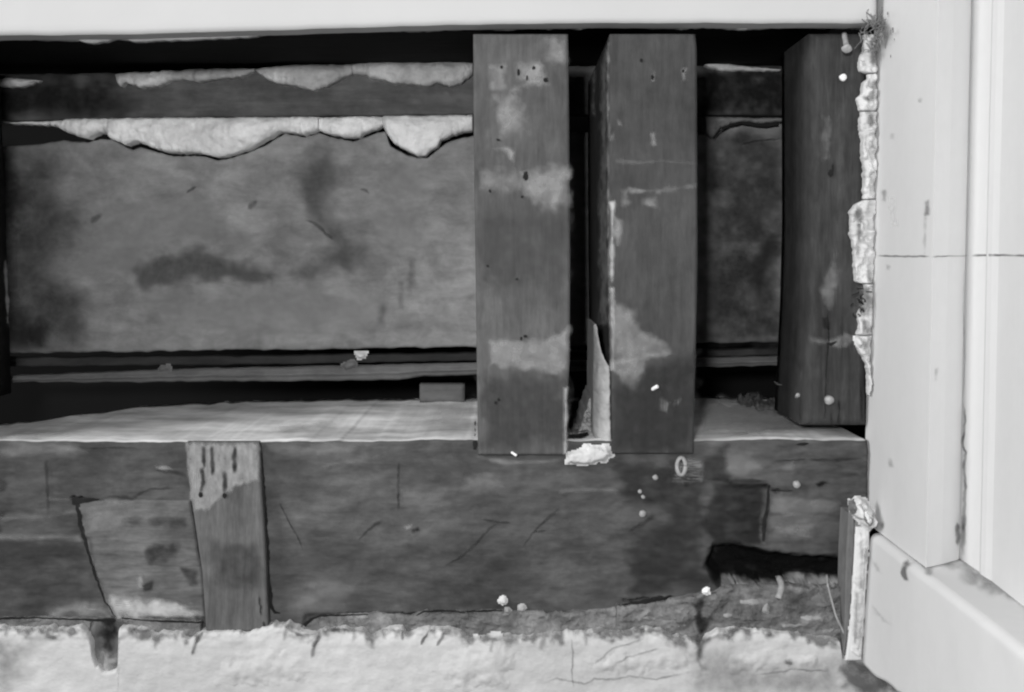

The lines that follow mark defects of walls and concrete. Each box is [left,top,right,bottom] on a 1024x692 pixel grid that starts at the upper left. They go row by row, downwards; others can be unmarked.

leakage [141,253,259,283]
flaking render [847,28,878,396]
leakage [621,451,838,592]